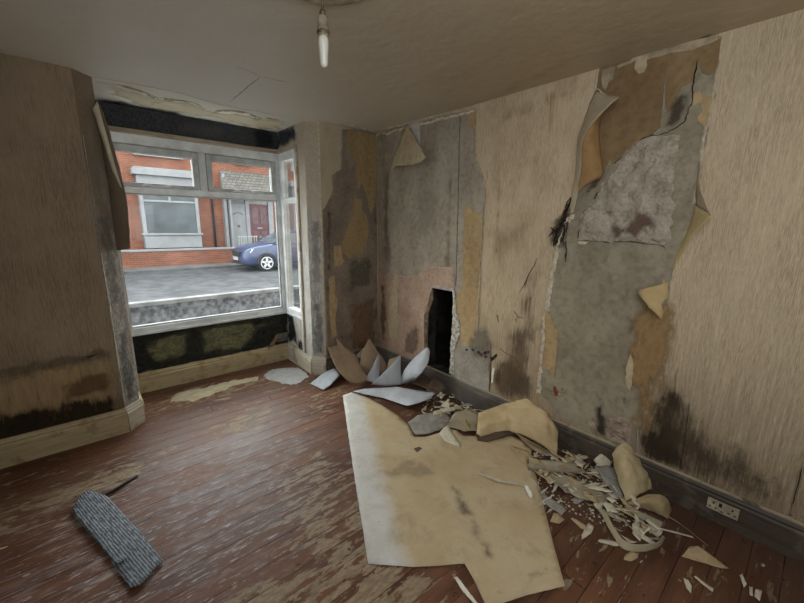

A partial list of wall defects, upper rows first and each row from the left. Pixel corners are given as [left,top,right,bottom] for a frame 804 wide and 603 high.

water stain [548,197,572,262]
flaking render [577,134,681,248]
water stain [132,313,302,374]
flaking render [378,267,487,391]
water stain [0,357,114,439]
water stain [597,406,605,435]
water stain [637,392,746,483]